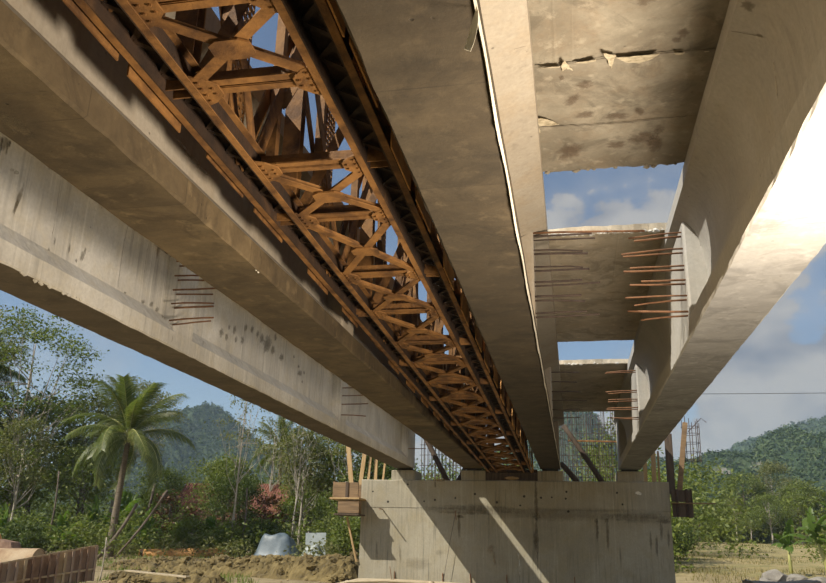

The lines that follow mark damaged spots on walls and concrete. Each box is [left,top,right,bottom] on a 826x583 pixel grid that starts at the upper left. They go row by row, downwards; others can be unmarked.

peeling [541,53,660,71]